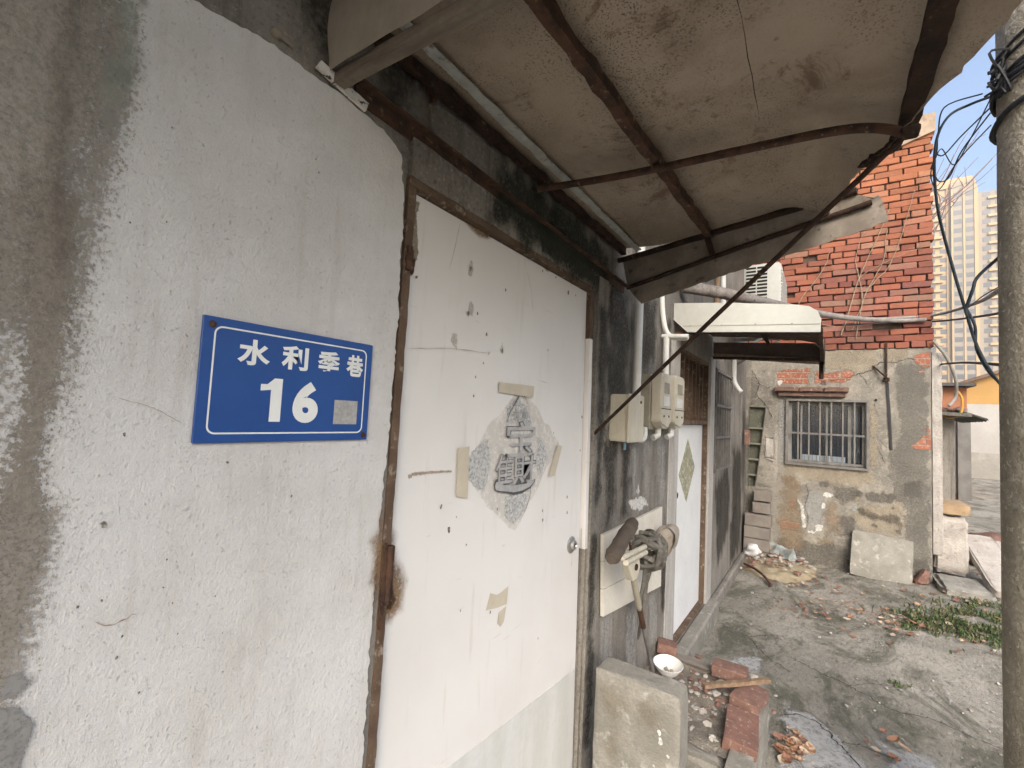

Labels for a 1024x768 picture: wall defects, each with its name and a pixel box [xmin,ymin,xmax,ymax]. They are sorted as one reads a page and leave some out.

leakage [489,158,671,519]
peeling [776,349,931,386]
spalling [777,399,878,549]
spalling [911,429,931,450]
corrosion [373,521,392,588]
corrosion [386,565,404,619]
leakage [583,536,612,747]
leakage [648,564,666,644]